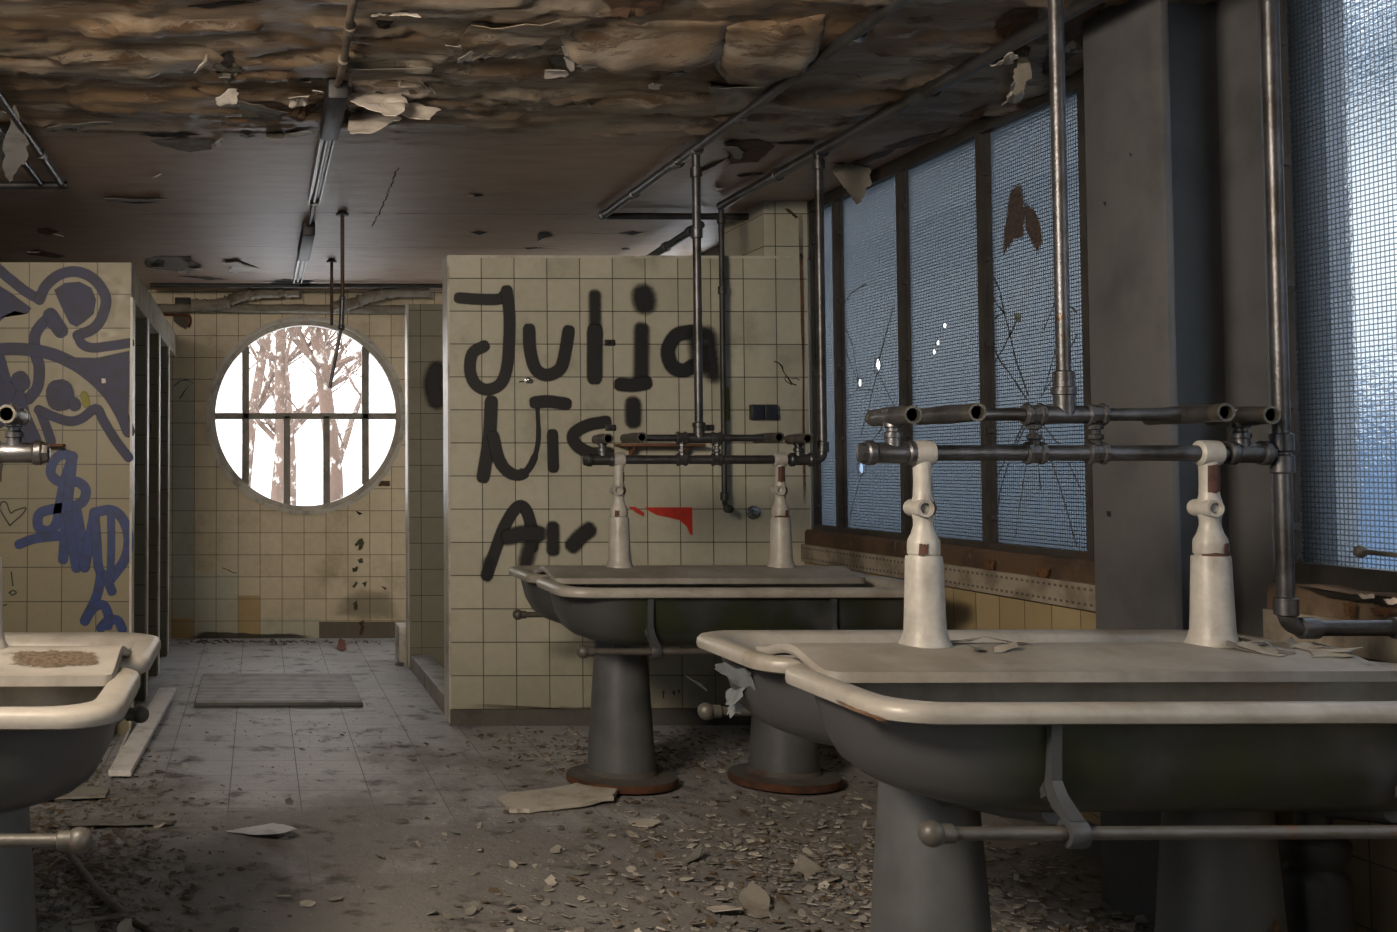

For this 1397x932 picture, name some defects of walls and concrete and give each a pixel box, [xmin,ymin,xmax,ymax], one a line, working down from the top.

peeling [139,51,324,152]
flaking render [343,67,441,134]
peeling [371,10,421,29]
peeling [445,21,597,79]
flaking render [603,0,665,18]
peeling [989,44,1032,106]
peeling [0,105,29,182]